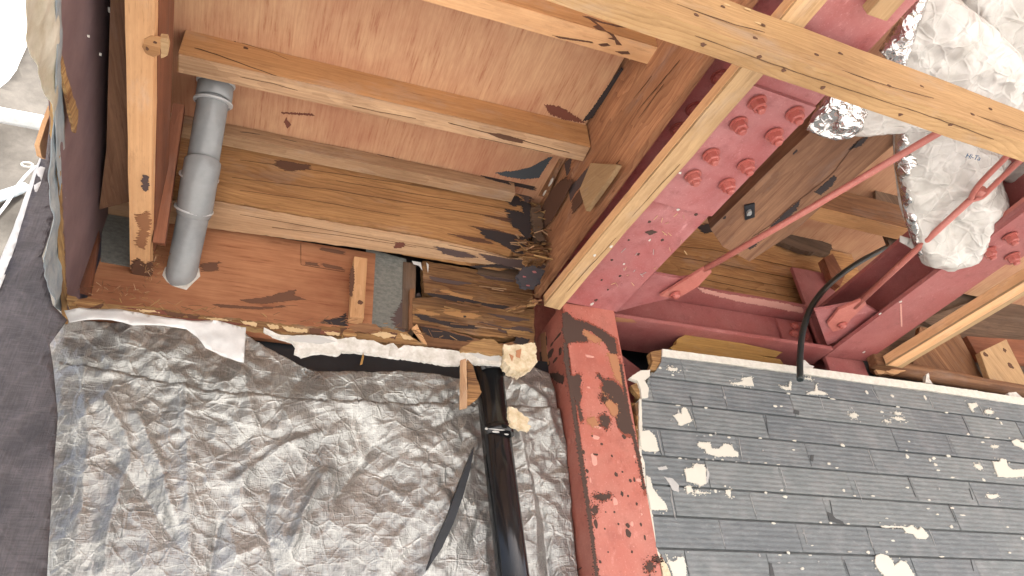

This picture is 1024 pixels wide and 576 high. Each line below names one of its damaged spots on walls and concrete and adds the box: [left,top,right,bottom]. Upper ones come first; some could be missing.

water stain [129,211,154,277]
water stain [415,157,593,345]
water stain [213,289,306,310]
spalling [729,375,754,389]
spalling [673,407,693,426]
rust [539,312,647,576]
spalling [628,350,688,576]
spalling [682,441,739,499]
spalling [973,437,1024,479]
spalling [879,522,929,539]
rust [642,554,666,576]
spalling [871,553,915,576]